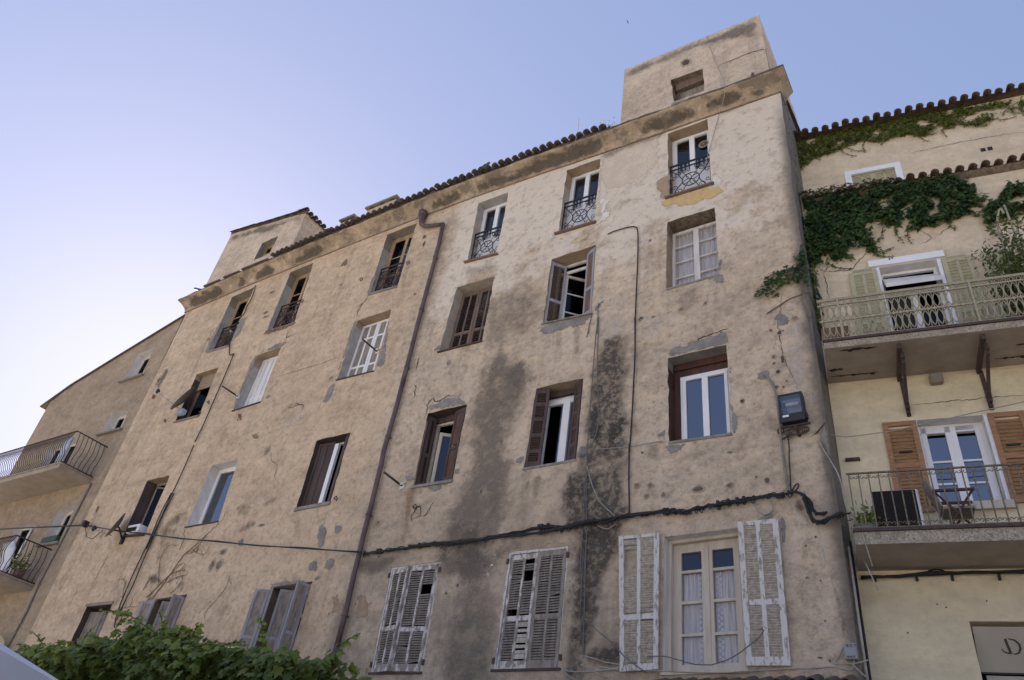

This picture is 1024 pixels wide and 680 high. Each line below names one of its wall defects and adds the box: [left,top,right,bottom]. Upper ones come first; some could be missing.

damp [641,100,694,133]
damp [707,89,763,109]
peeling [560,135,725,243]
damp [442,354,525,680]
damp [564,336,628,675]